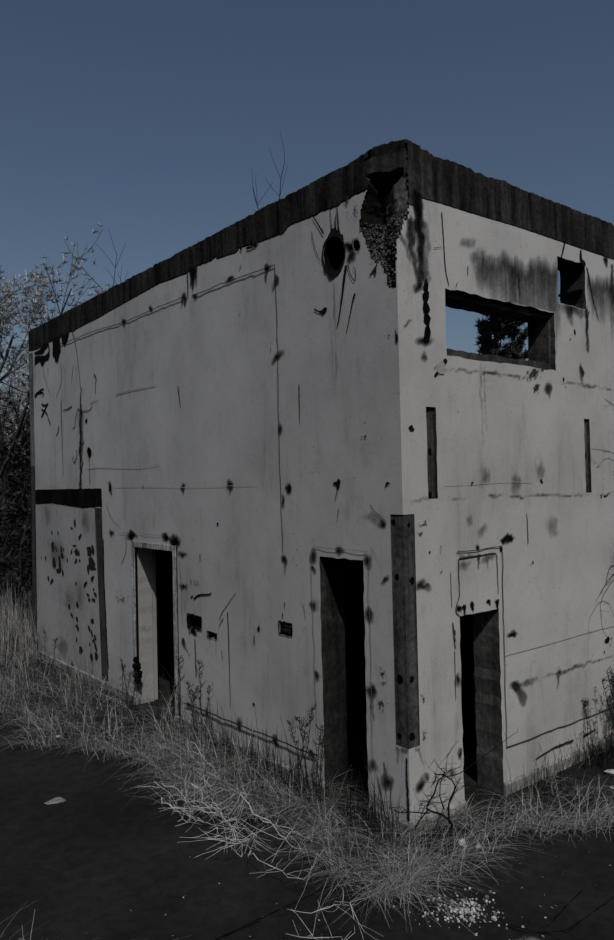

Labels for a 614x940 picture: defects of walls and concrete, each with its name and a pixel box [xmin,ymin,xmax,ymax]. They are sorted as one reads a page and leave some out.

spalling [359,151,409,289]
leakage [400,187,430,283]
leakage [473,254,614,352]
leakage [511,368,544,396]
crack [477,890,614,935]